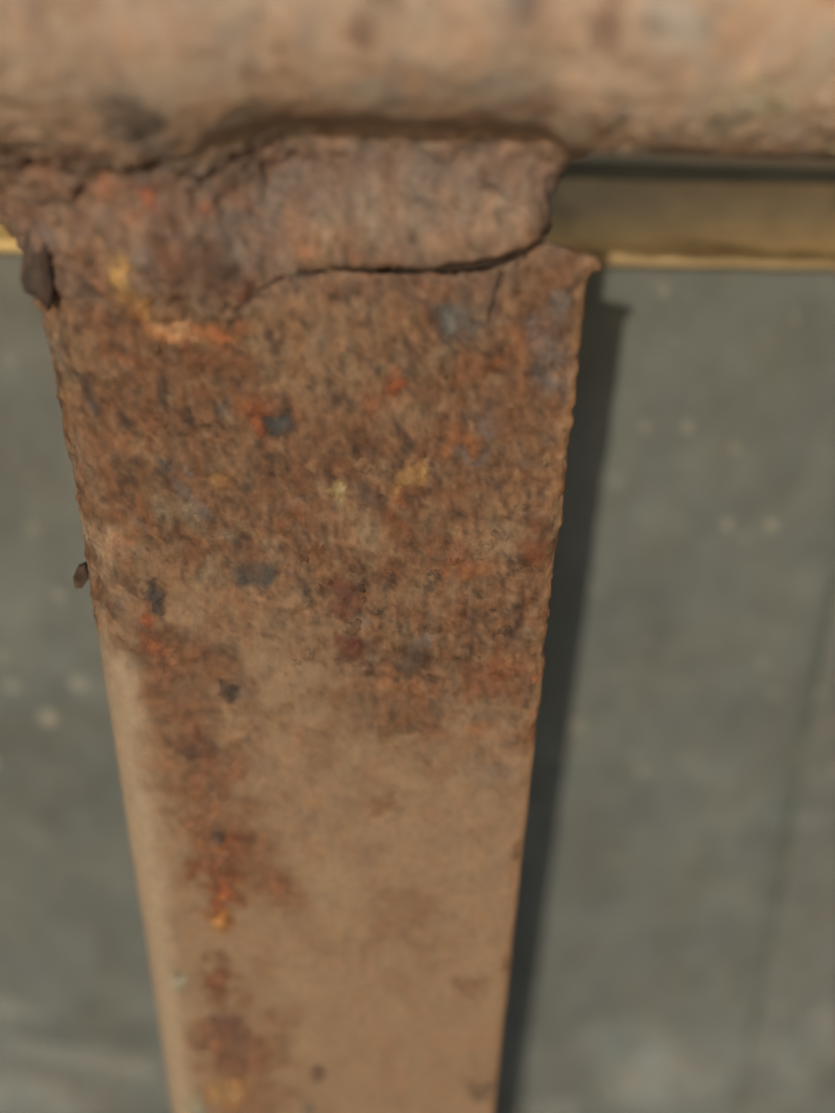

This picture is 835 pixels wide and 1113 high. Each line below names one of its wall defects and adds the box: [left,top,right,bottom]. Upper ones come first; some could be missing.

corrosion [20,227,54,311]
corrosion [109,257,250,377]
crack [223,228,545,323]
corrosion [73,561,89,588]